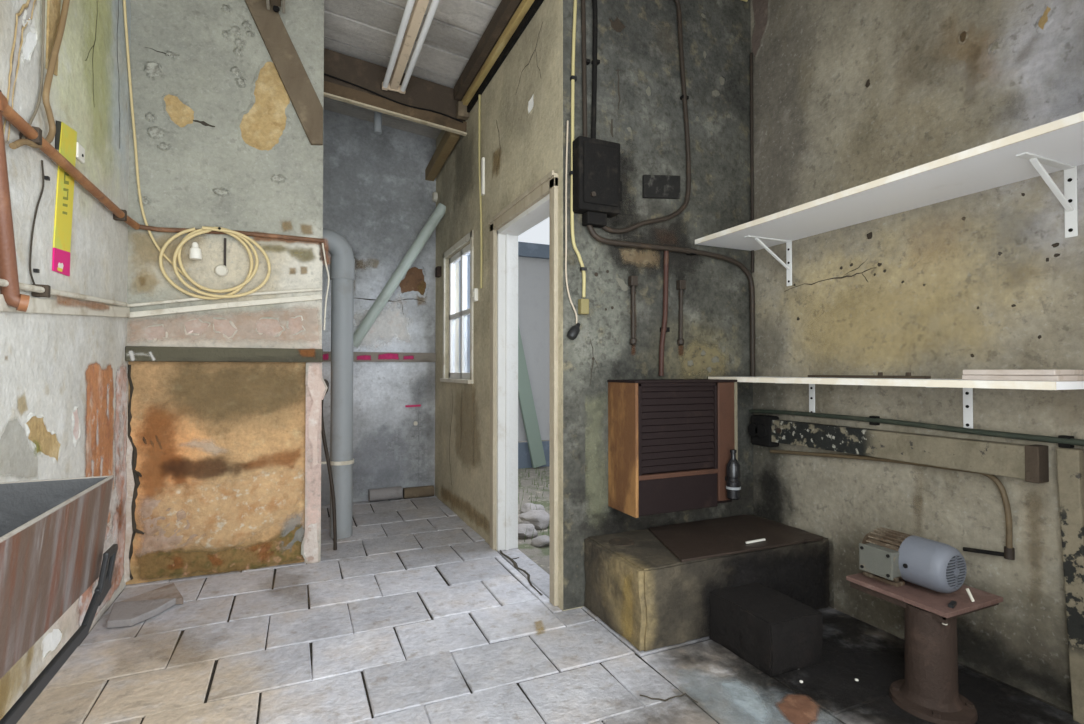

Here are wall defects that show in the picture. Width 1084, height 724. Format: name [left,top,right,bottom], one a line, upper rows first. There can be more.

flaking render [144,92,215,152]
flaking render [235,58,292,155]
flaking render [396,264,429,299]
crack [784,262,877,292]
leakage [143,412,184,501]
flaking render [24,362,328,626]
leakage [283,515,305,547]
crack [500,550,543,595]